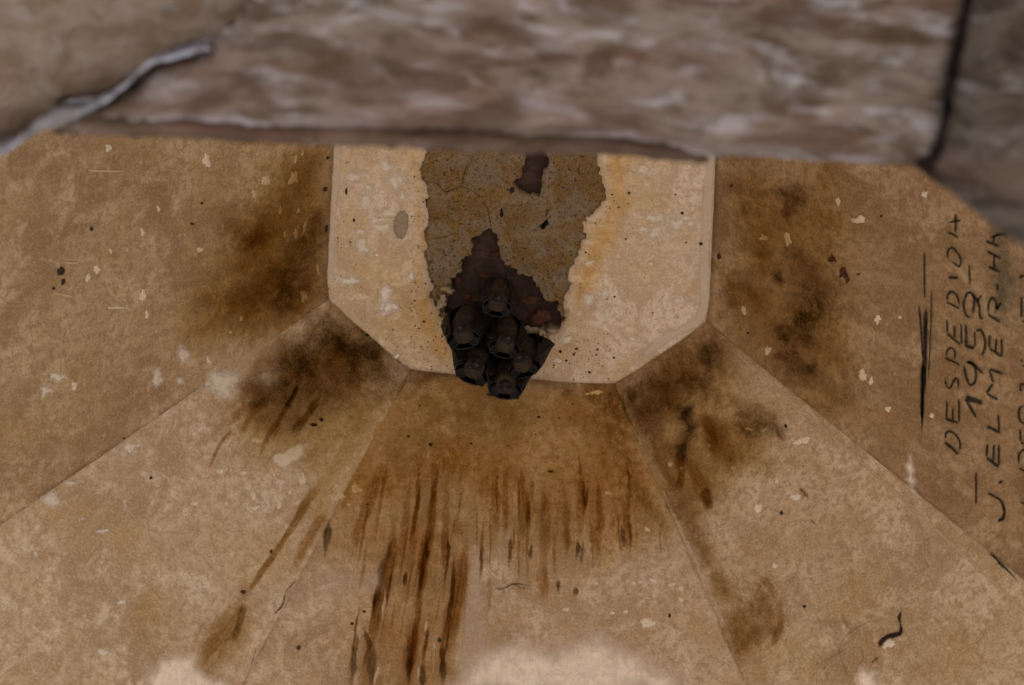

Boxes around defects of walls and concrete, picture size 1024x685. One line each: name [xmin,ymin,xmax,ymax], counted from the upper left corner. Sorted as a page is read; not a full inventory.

flaking render [420,149,609,344]
water stain [248,316,381,411]
water stain [628,348,718,468]